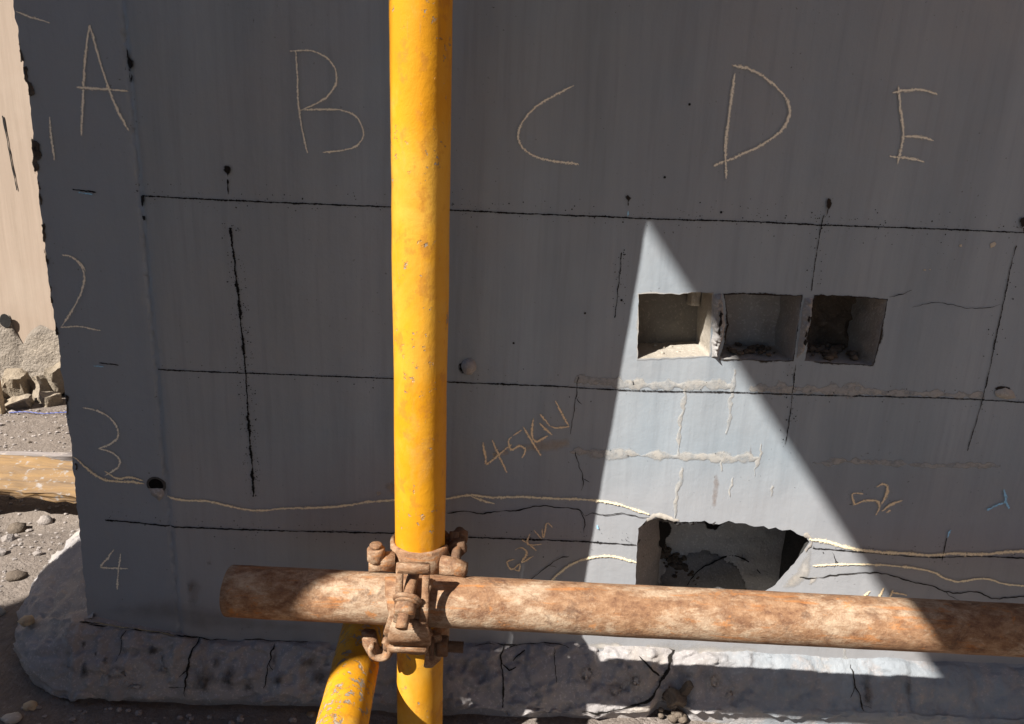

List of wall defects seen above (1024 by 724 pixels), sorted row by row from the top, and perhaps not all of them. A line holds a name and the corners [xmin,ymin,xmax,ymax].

crack [448,377,649,528]
spalling [635,513,813,591]
crack [802,552,1024,600]
crack [80,621,308,696]
crack [479,642,569,708]
crack [582,648,675,716]